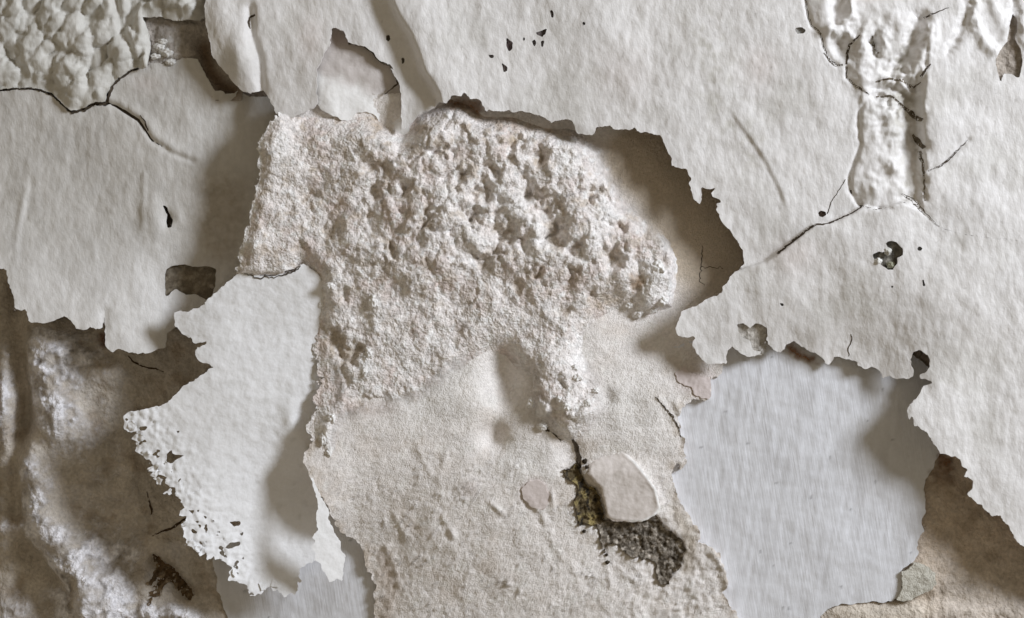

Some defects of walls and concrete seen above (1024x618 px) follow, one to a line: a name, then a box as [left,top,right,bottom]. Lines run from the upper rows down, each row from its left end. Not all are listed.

peeling [506,10,554,51]
crack [805,0,869,94]
crack [6,69,162,147]
crack [777,179,882,254]
flaking render [296,28,1024,618]
peeling [128,421,162,485]
peeling [188,540,206,556]
leakage [563,458,686,585]